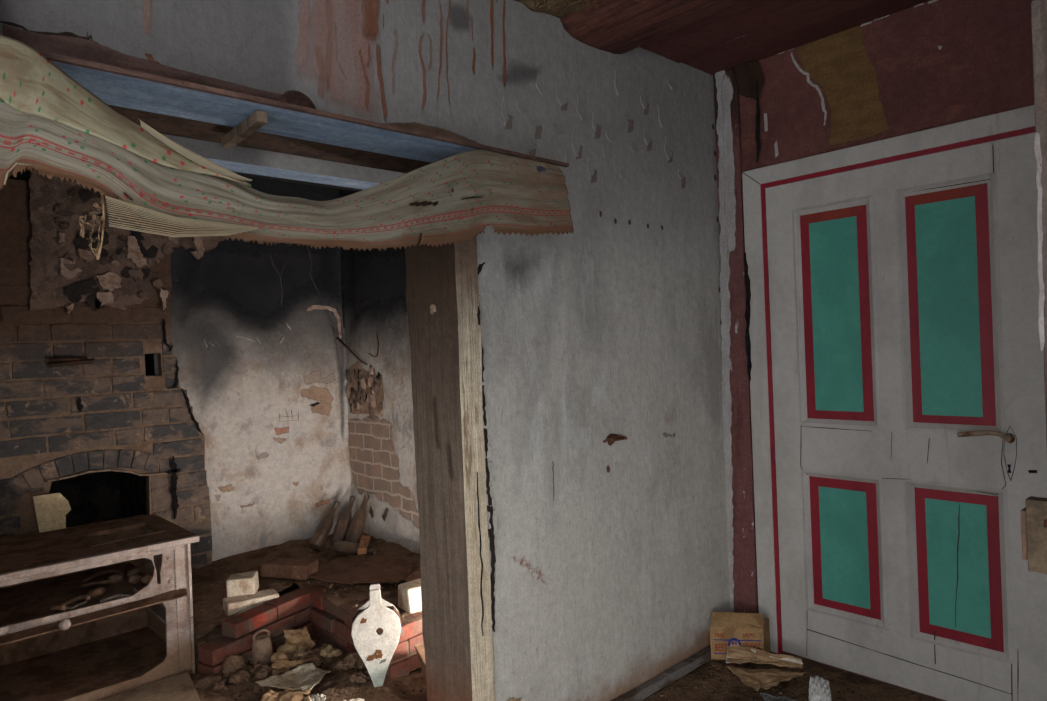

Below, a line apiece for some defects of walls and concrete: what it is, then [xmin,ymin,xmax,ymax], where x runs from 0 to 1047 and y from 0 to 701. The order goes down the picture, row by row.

rust [359,0,397,118]
rust [419,0,451,110]
rust [490,0,506,85]
peeling [779,15,889,146]
flaking render [28,170,226,314]
flaking render [301,361,419,528]
crack [477,303,496,632]
flaking render [603,434,627,446]